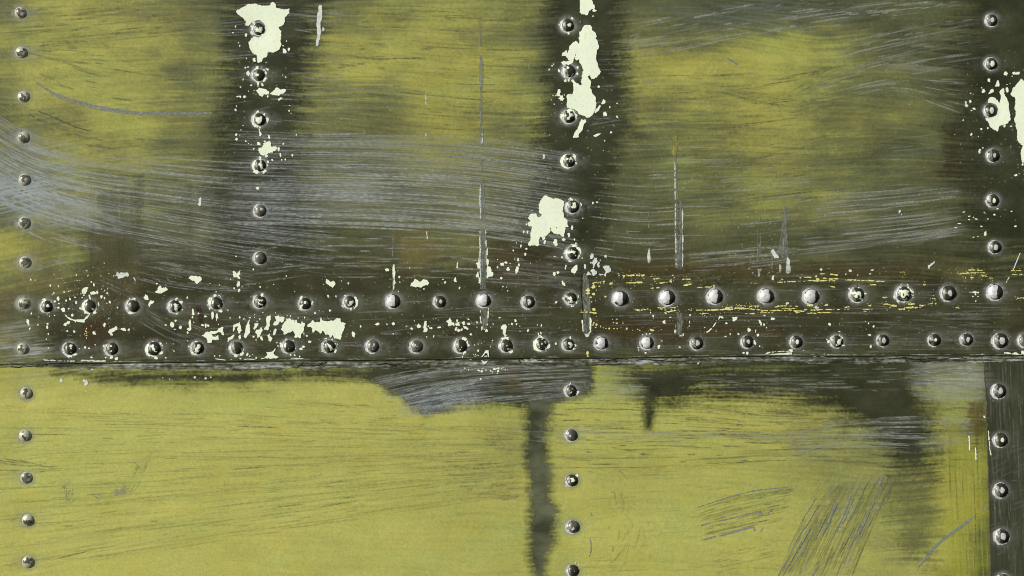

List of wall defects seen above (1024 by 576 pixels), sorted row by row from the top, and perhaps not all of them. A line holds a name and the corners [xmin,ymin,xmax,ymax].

peeling [232,2,290,112]
peeling [549,0,618,151]
peeling [962,72,1024,176]
peeling [26,263,362,392]
peeling [476,195,849,364]
peeling [772,268,936,348]